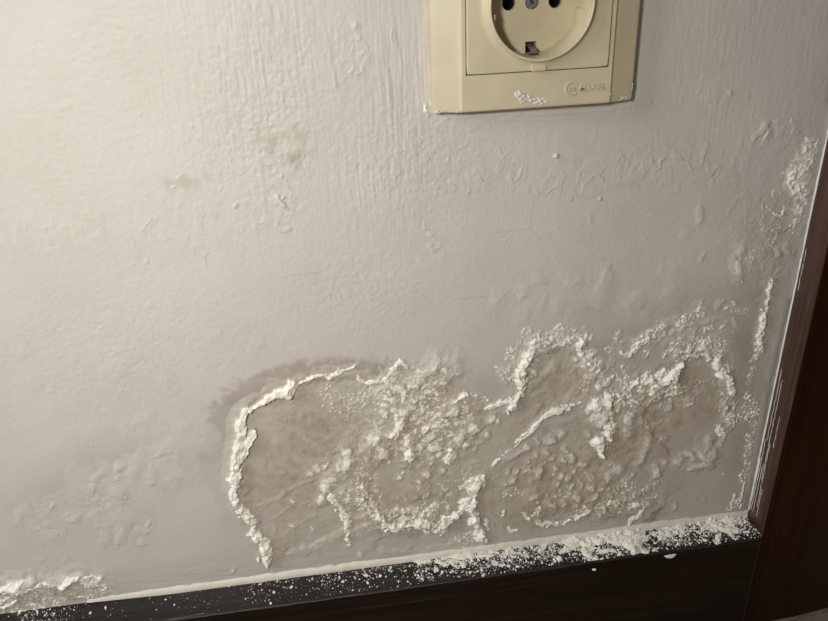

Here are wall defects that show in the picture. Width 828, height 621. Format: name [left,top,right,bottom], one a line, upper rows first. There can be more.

peeling [219,297,751,574]
efflorescence [721,134,822,513]